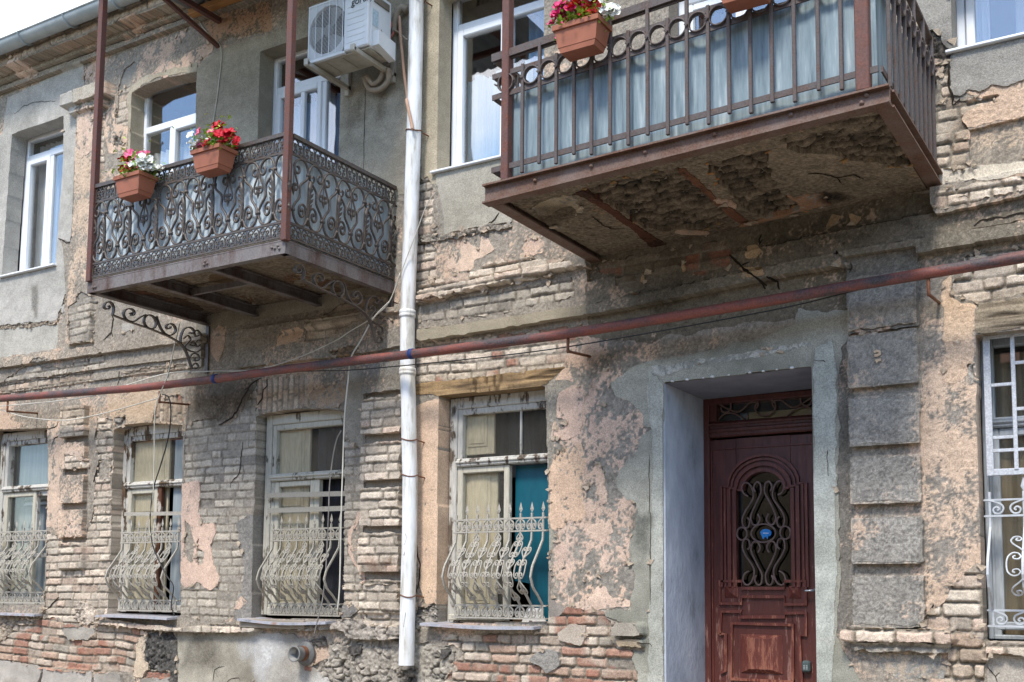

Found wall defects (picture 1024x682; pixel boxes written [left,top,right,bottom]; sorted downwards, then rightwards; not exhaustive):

spalling [415,177,578,323]
spalling [529,150,861,237]
crack [729,235,780,290]
crack [808,173,864,184]
spalling [785,111,914,168]
spalling [926,28,1024,210]
crack [974,212,1024,226]
crack [219,378,268,425]
spalling [152,361,310,635]
peeling [304,325,812,682]
spalling [0,414,178,682]